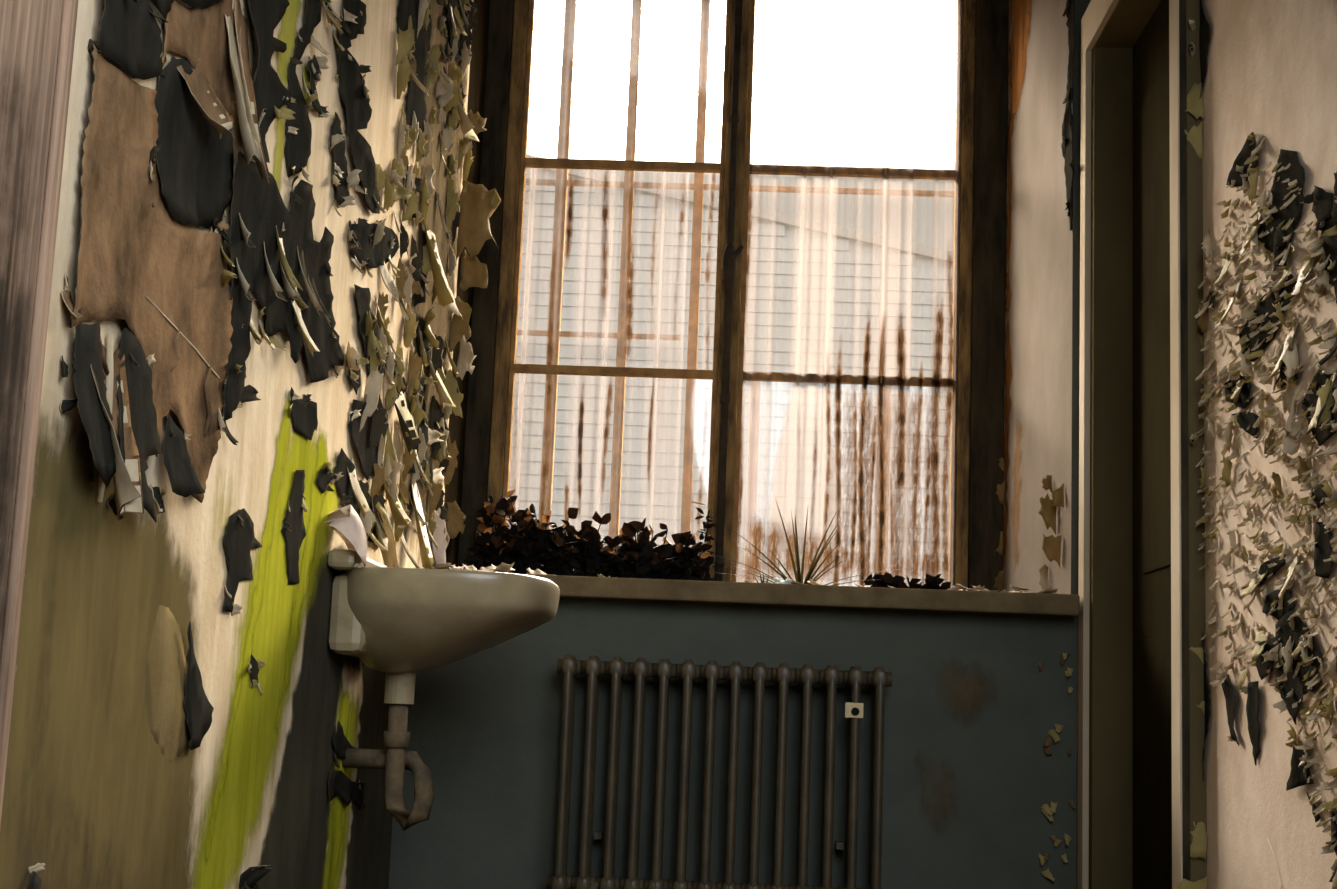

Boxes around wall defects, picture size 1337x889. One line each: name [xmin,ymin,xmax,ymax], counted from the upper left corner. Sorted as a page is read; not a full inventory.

peeling [1185,0,1211,159]
peeling [60,0,502,585]
flaking render [223,508,263,616]
peeling [947,475,1064,594]
peeling [1189,132,1337,889]
peeling [238,865,272,889]
peeling [1176,876,1208,889]
peeling [1182,821,1208,860]